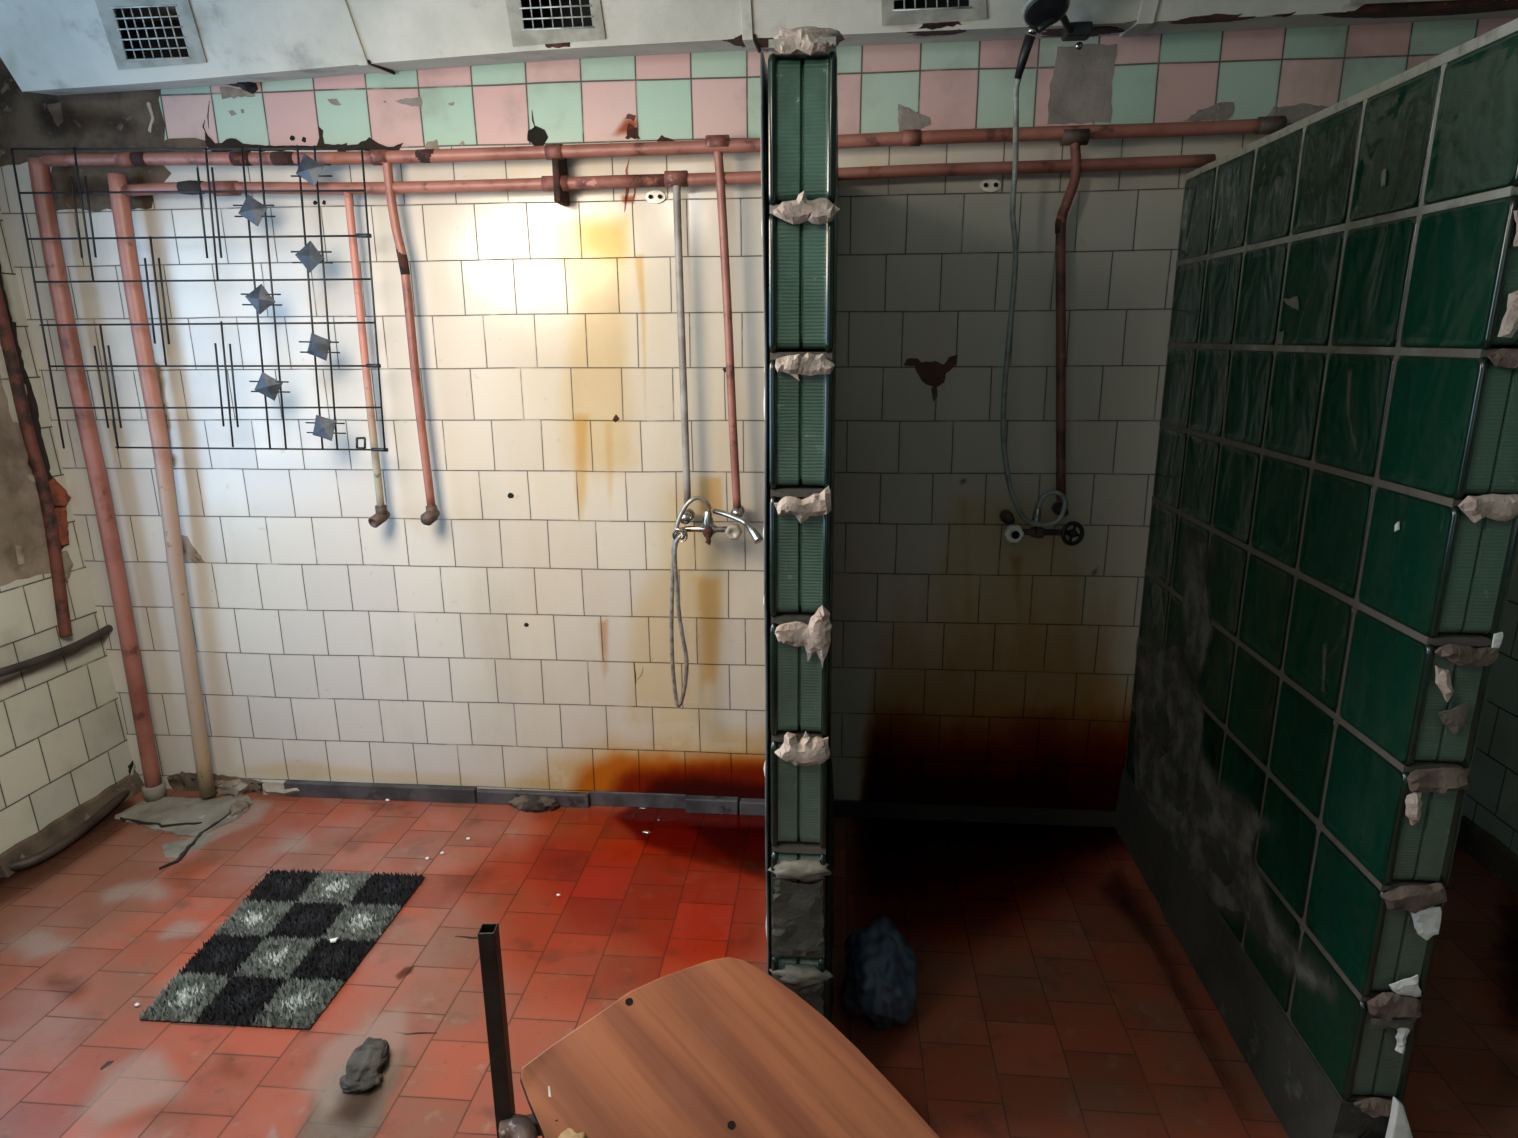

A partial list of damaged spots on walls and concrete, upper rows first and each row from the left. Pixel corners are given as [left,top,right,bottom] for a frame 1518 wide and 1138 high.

rust [1041,28,1063,37]
rust [1090,20,1137,37]
rust [1167,12,1295,24]
rust [1317,0,1518,18]
peeling [1047,44,1117,124]
flaking render [0,57,403,211]
flaking render [0,374,51,586]
rust [620,769,765,800]